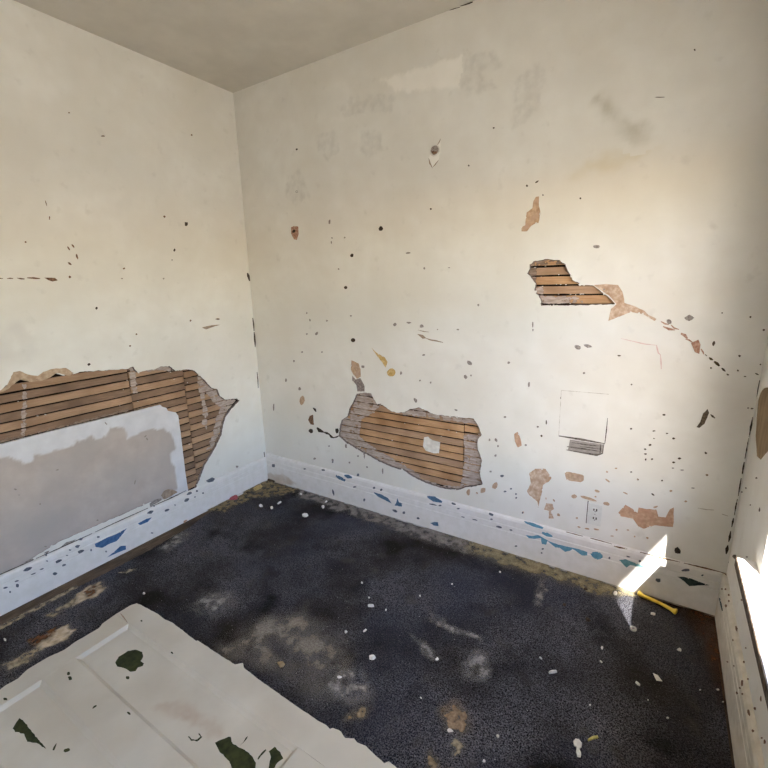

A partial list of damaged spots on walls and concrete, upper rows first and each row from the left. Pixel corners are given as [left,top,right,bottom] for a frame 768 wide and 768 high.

spalling [520,194,544,231]
spalling [527,259,656,321]
spalling [339,361,517,506]
spalling [747,387,768,460]
spalling [0,366,239,575]
spalling [527,468,560,519]
spalling [522,505,674,569]